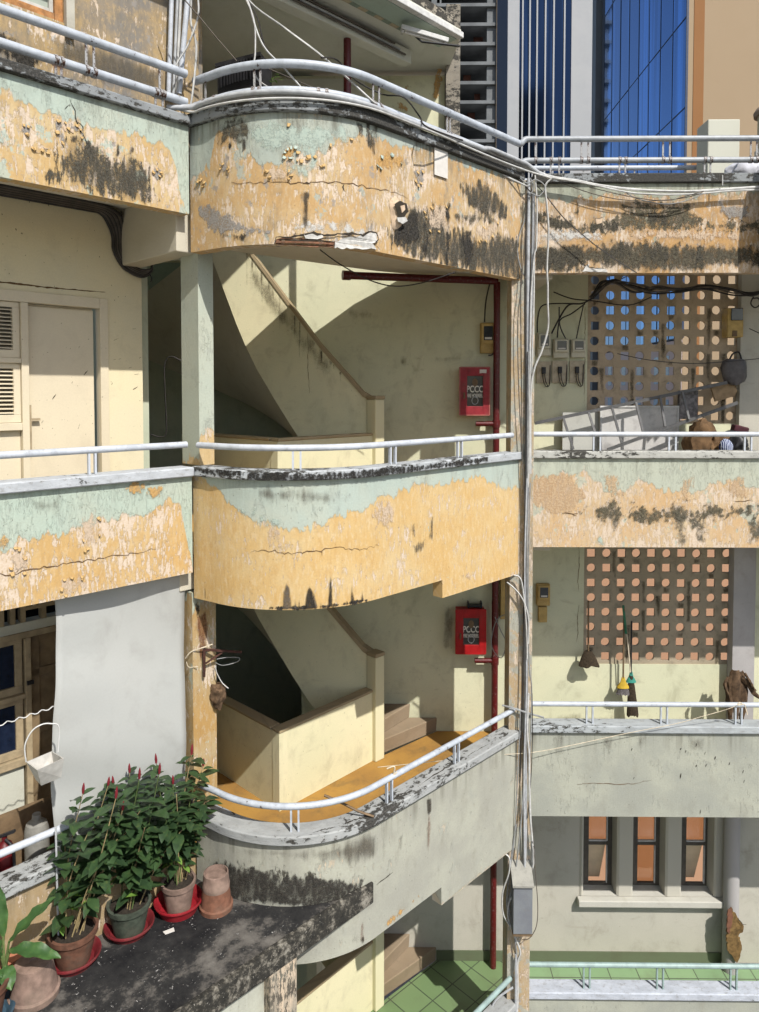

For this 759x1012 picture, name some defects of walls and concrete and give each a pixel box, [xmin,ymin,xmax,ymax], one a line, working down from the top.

peeling [55,119,83,145]
damp [45,136,155,203]
peeling [251,121,354,180]
crack [232,181,406,198]
spalling [198,204,379,250]
damp [388,179,520,279]
damp [535,196,759,273]
peeling [127,482,162,497]
crack [0,549,154,576]
crack [252,546,372,554]
damp [270,580,368,610]
damp [213,861,363,906]